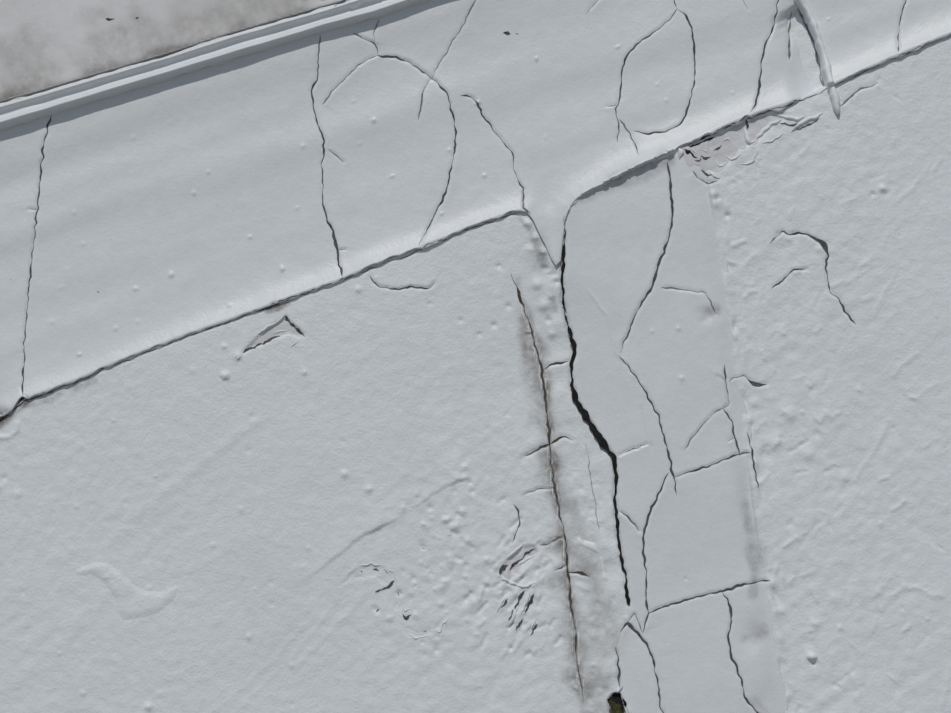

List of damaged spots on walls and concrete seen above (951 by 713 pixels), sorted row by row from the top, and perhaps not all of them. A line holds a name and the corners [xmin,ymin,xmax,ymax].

crack [0,0,530,422]
spalling [237,315,305,360]
spalling [678,113,822,178]
crack [612,0,950,153]
crack [770,231,855,323]
crack [511,162,770,713]